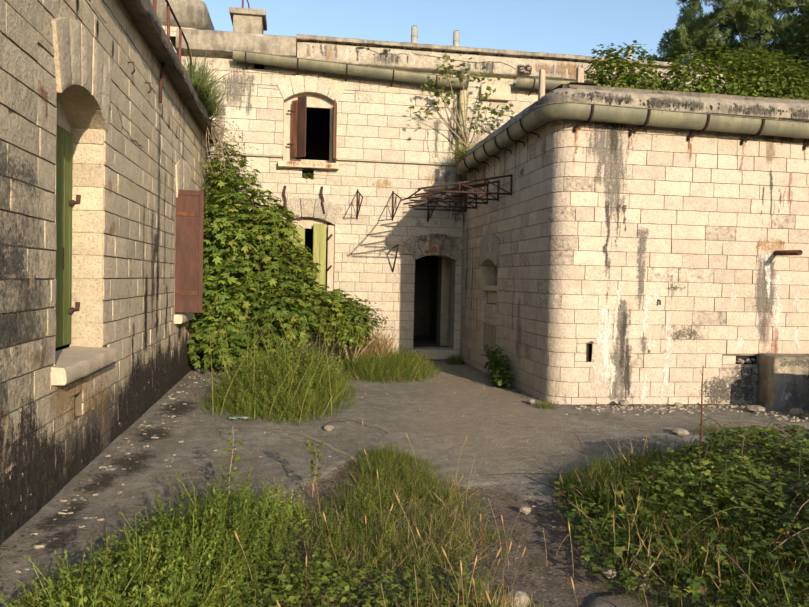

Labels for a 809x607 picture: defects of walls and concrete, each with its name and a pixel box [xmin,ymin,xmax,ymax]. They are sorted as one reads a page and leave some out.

leakage [0,113,204,553]
leakage [586,121,673,402]
leakage [756,252,782,340]